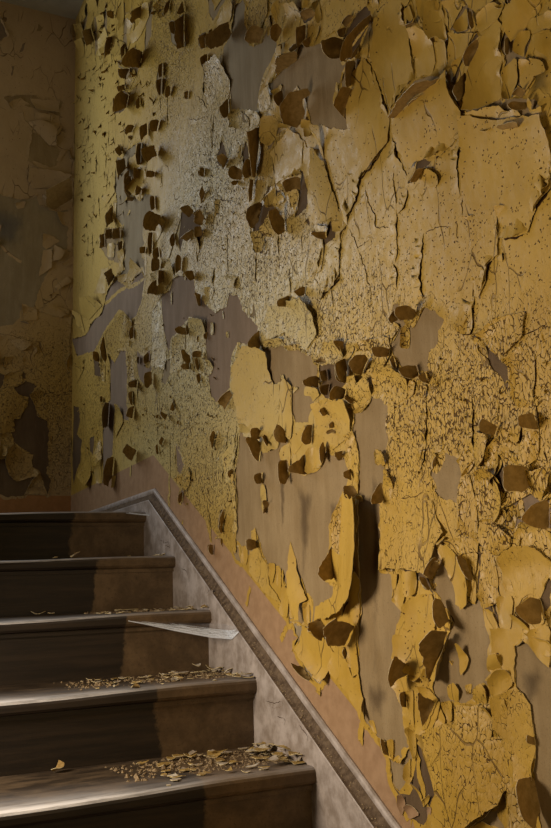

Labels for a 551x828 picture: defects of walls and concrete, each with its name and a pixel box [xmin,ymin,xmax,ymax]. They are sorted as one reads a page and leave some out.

peeling [73,0,186,128]
crack [368,0,415,113]
peeling [118,121,134,142]
peeling [215,134,231,172]
peeling [197,186,240,224]
crack [316,114,551,310]
peeling [192,351,202,389]
peeling [0,369,61,500]
peeling [142,395,175,454]
peeling [122,438,137,477]
peeling [215,502,226,546]
peeling [157,742,305,786]